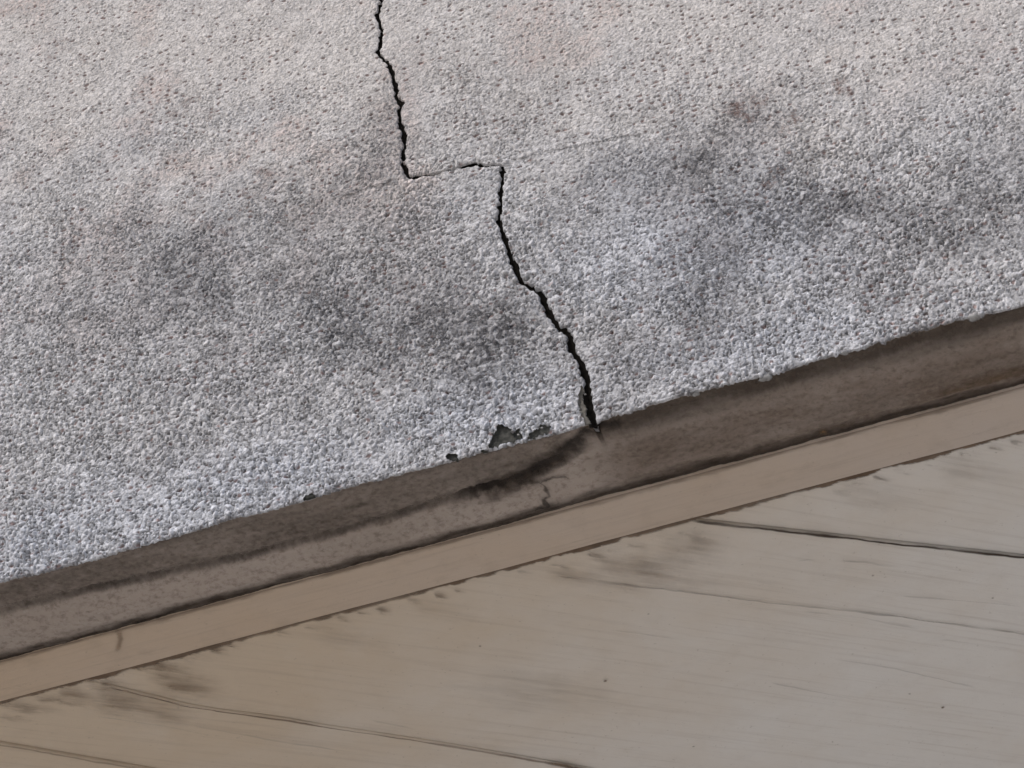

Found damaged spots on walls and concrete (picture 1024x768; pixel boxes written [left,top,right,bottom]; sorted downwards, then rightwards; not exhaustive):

crack [349,0,600,429]
spalling [481,420,551,454]